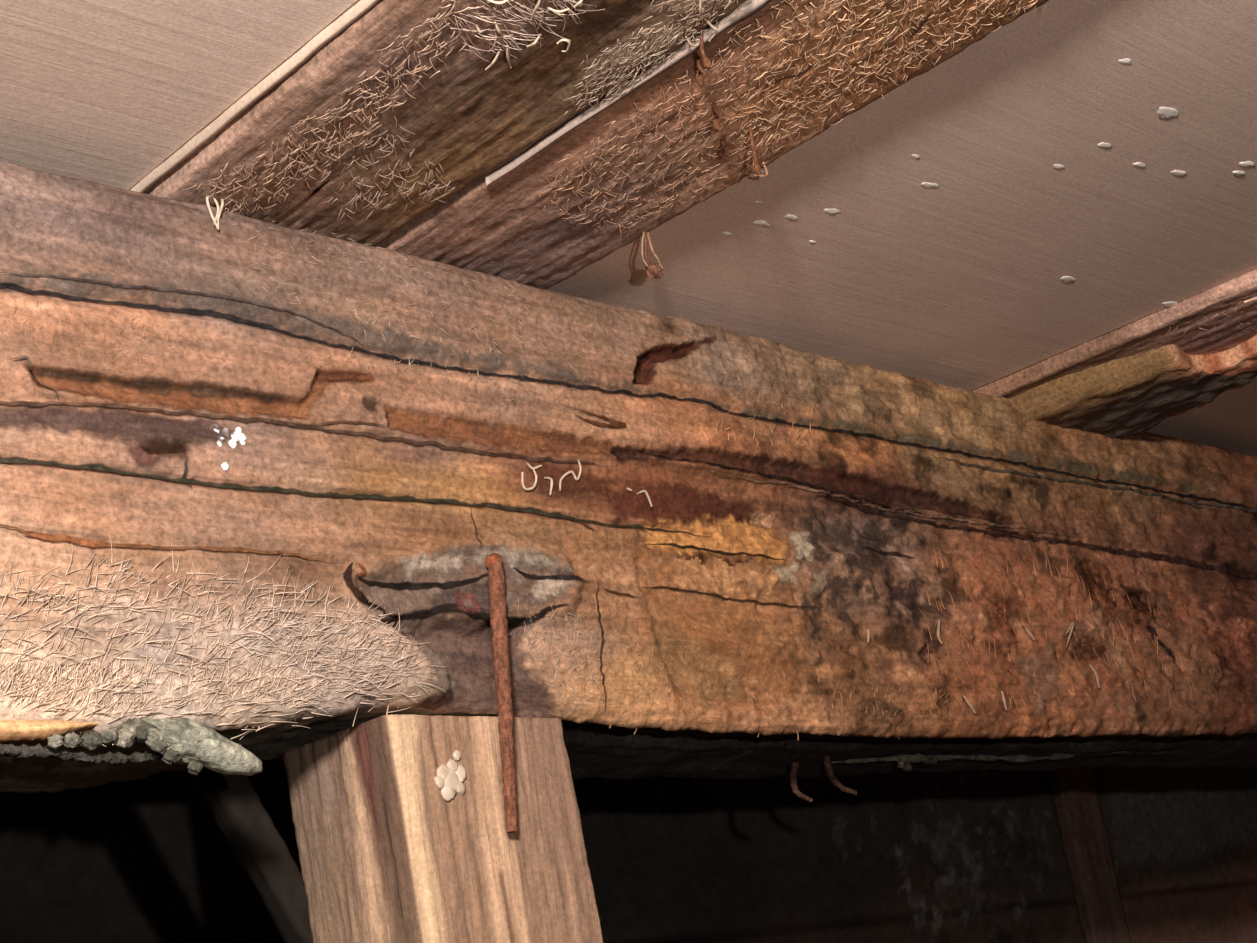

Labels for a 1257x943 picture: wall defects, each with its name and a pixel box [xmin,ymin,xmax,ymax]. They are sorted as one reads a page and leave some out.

water stain [2,273,659,398]
water stain [800,513,938,663]
water stain [824,753,1088,943]